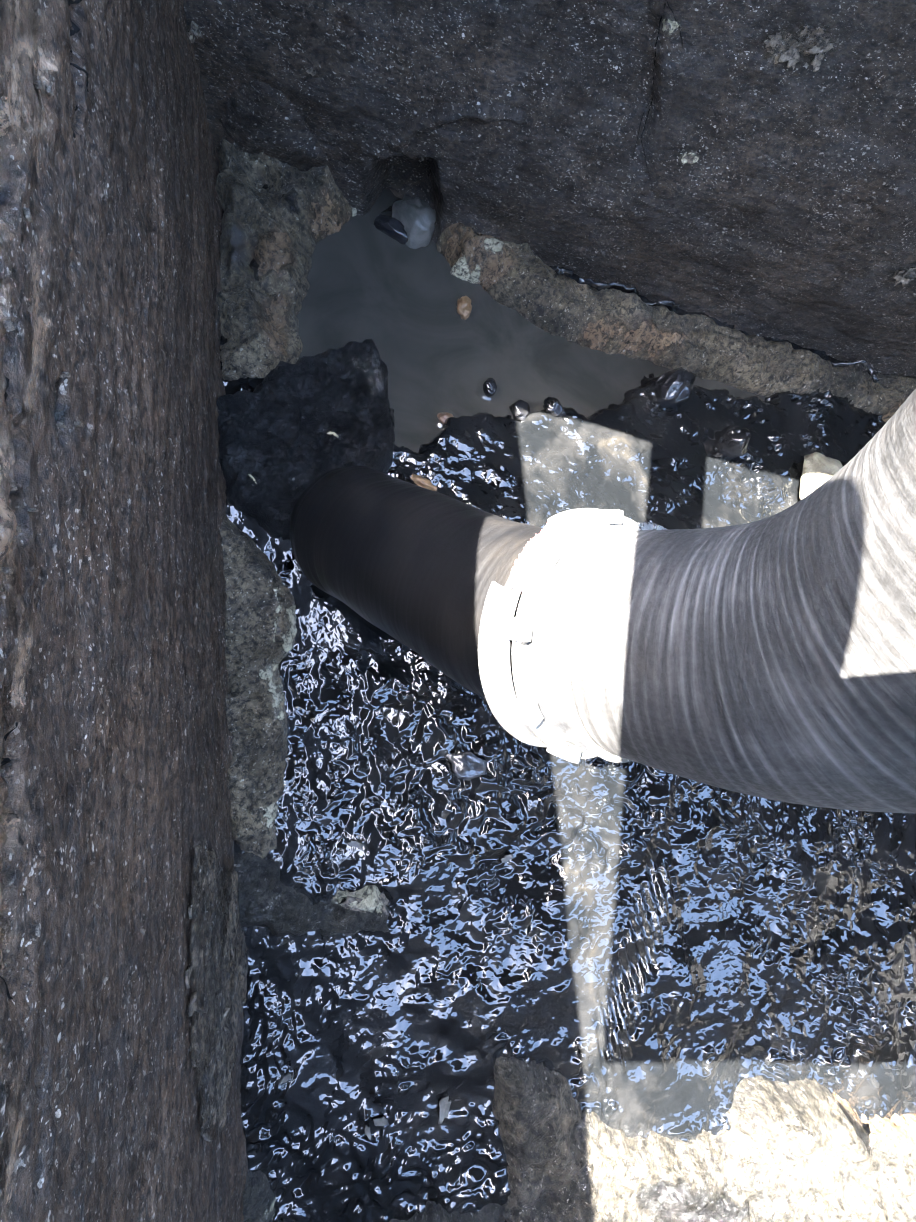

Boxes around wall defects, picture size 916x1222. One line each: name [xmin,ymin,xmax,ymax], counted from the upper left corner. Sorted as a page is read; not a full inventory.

crack [632,1,683,180]